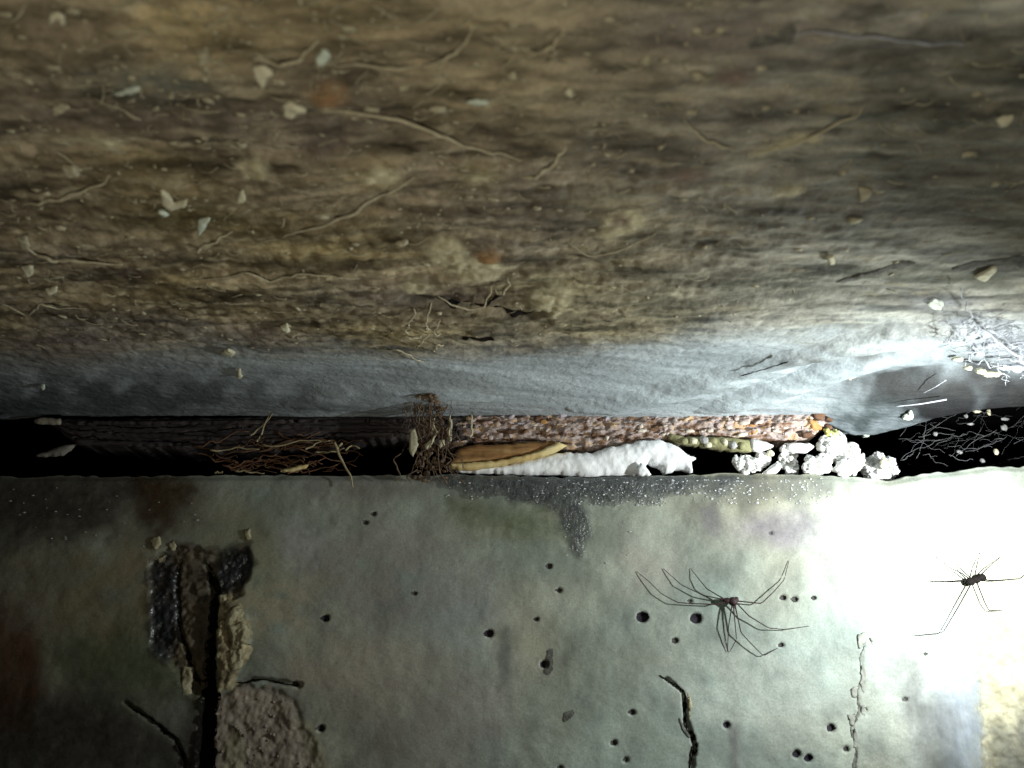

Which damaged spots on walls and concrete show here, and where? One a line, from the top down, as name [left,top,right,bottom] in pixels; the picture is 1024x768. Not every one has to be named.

damp [443,475,830,557]
crack [126,560,300,768]
spalling [147,528,325,768]
crack [659,675,698,768]
crack [847,632,875,768]